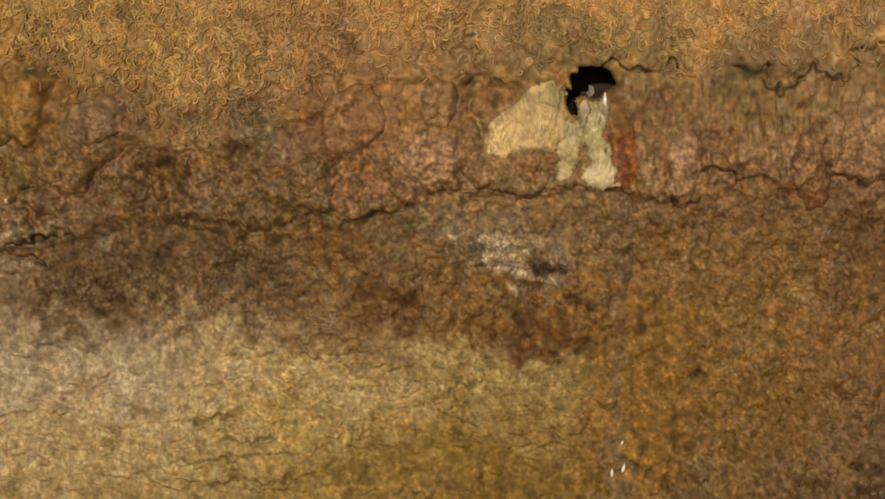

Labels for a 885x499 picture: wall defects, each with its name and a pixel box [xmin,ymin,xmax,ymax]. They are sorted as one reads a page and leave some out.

peeling [484,80,618,191]
corrosion [611,119,636,189]
crack [701,165,738,181]
crack [835,174,885,187]
crack [0,234,68,266]